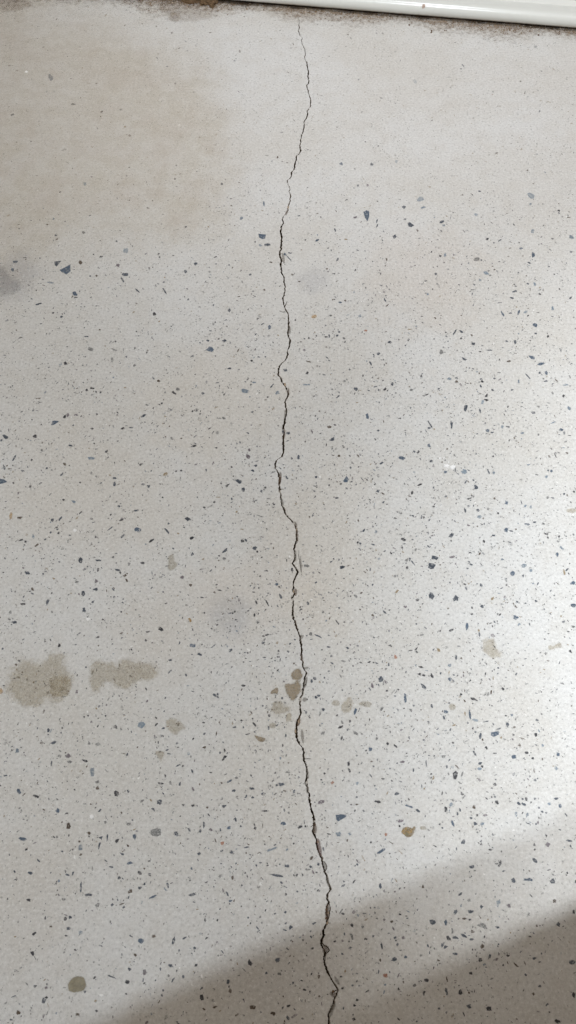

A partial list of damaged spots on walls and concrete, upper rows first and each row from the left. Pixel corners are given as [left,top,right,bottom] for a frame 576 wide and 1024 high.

crack [274,18,339,1024]